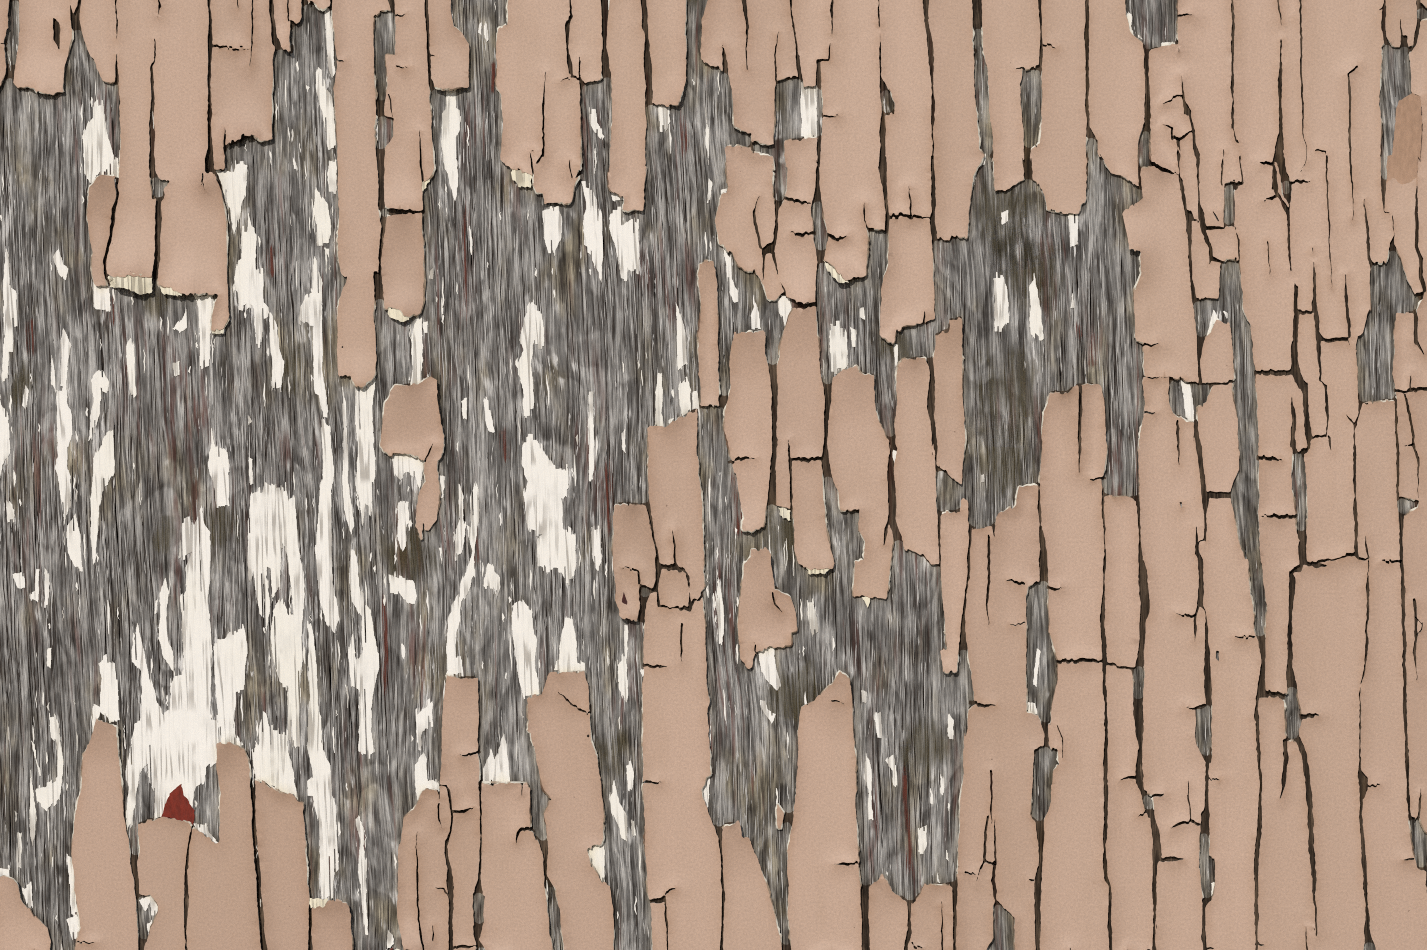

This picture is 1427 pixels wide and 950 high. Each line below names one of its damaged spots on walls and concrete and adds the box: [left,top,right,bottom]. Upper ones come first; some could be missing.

crack [103,0,165,286]
crack [202,0,332,190]
crack [373,0,435,301]
crack [518,0,655,186]
crack [711,0,965,309]
peeling [811,29,1147,529]
peeling [1138,131,1150,167]
peeling [0,0,974,950]
crack [728,363,875,533]
crack [838,0,1427,950]
peeling [1026,581,1057,722]
peeling [1133,666,1144,699]